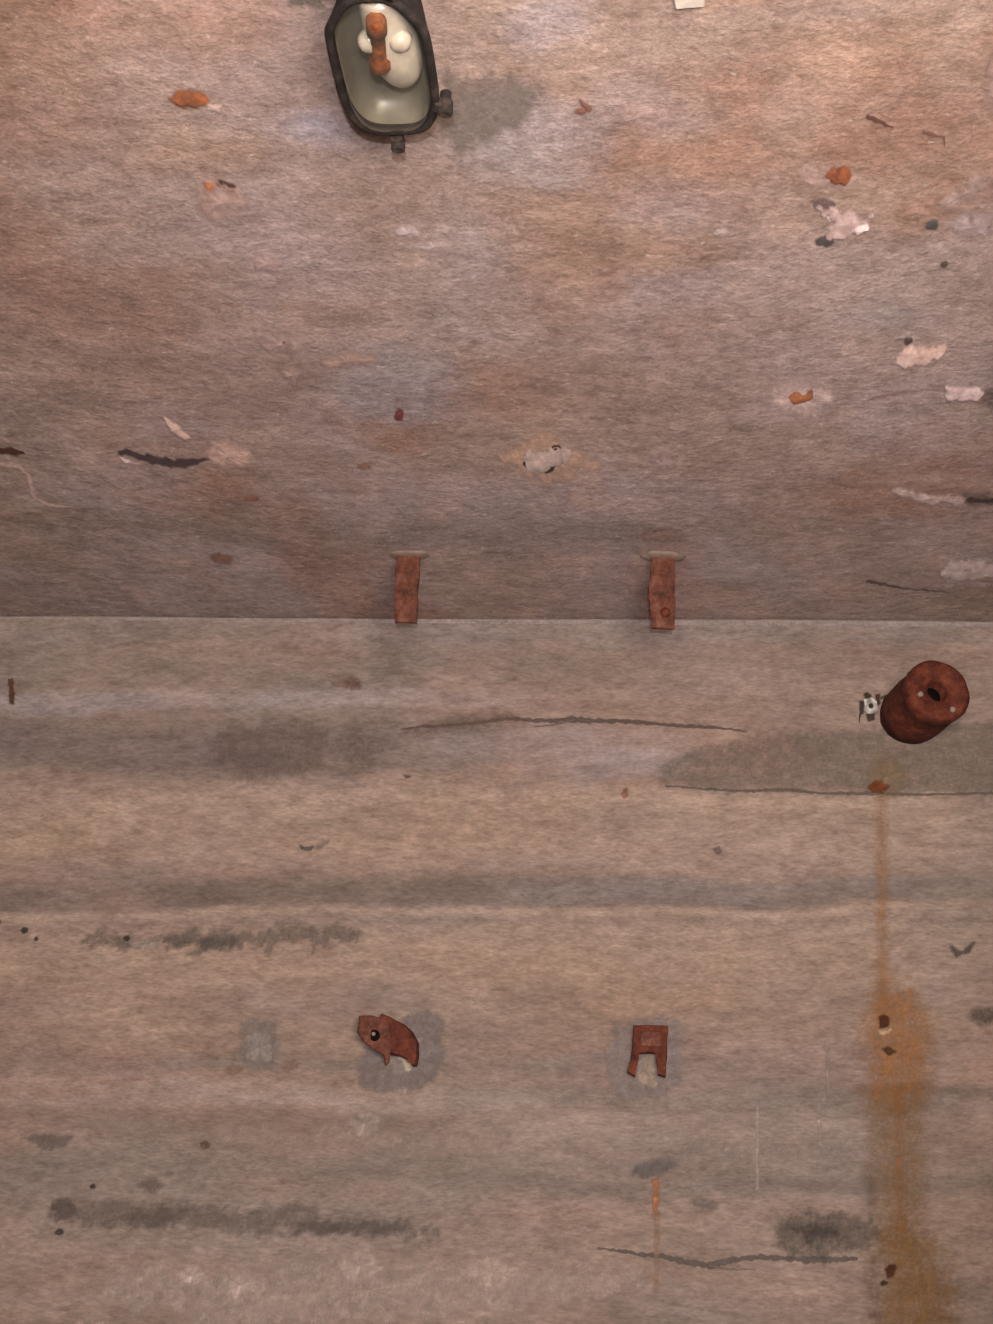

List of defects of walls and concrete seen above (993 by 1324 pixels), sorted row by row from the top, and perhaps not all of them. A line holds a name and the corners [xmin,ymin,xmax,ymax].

spalling [813,199,875,247]
crack [401,715,747,733]
corrosion [868,762,900,793]
damp [87,926,358,954]
corrosion [869,964,924,1192]
damp [52,1199,426,1238]
crack [597,1247,858,1271]
corrosion [881,1214,945,1324]